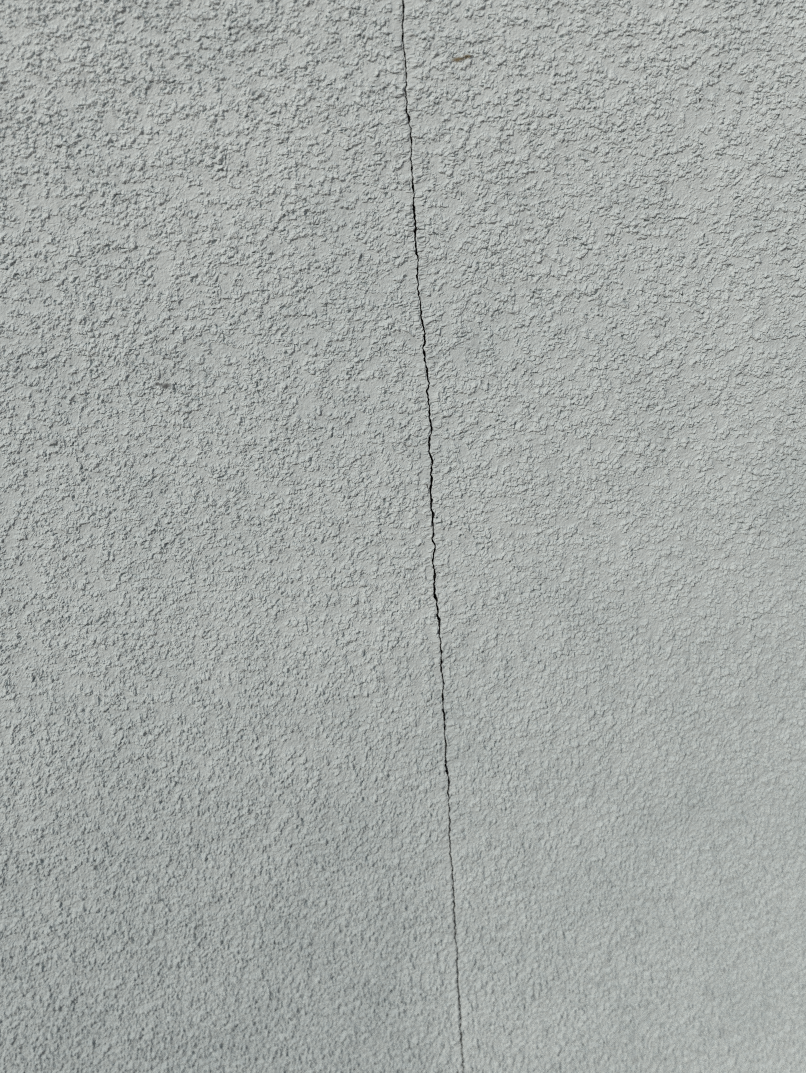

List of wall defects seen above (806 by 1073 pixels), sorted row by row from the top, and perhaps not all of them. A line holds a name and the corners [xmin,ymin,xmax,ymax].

crack [401,0,464,1073]